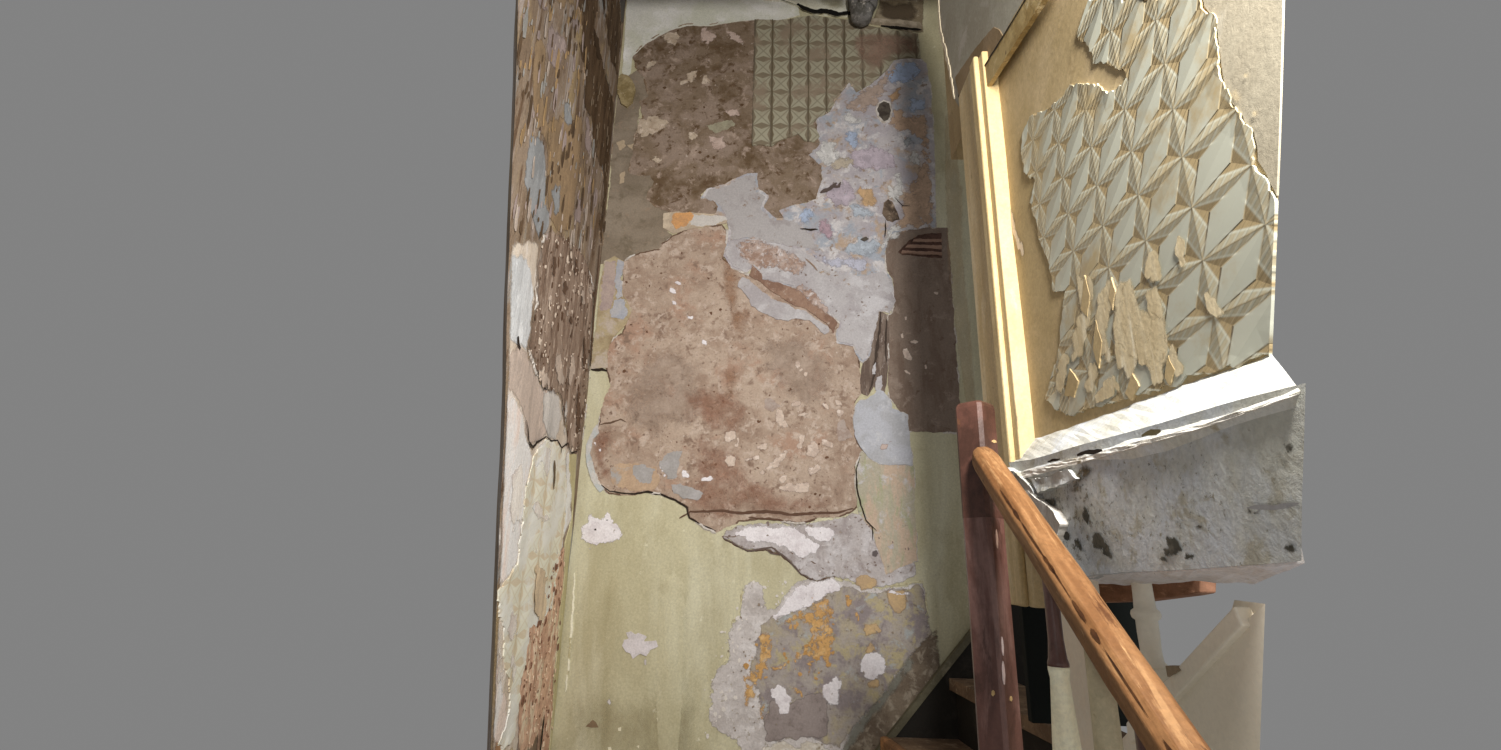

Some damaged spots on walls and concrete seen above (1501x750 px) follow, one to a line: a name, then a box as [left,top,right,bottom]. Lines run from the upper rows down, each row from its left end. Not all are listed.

crack [783,0,922,30]
peeling [938,0,1003,99]
crack [984,0,1025,67]
flaking render [1203,0,1285,196]
spalling [513,0,960,750]
peeling [1008,467,1080,542]
spalling [495,547,565,750]
peeling [991,637,1013,702]
spalling [1001,491,1150,719]